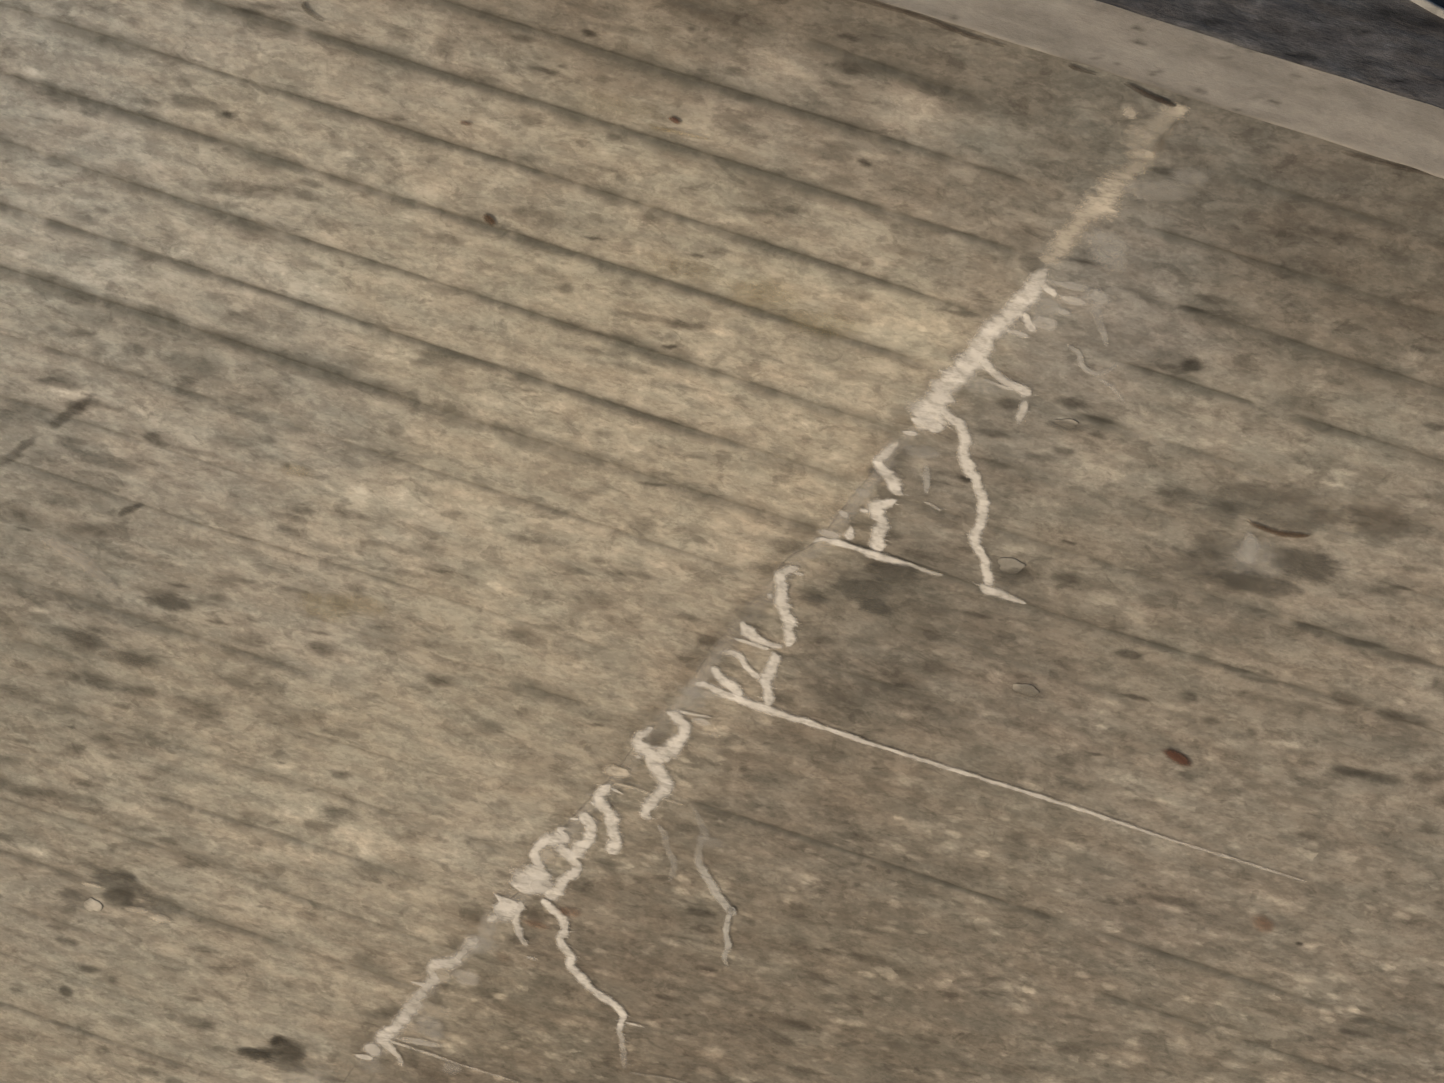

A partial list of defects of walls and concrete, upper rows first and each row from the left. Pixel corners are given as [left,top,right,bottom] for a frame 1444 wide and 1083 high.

water stain [814,172,1131,604]
water stain [696,566,1136,828]
water stain [355,958,461,1060]
efflorescence [488,711,693,1033]
water stain [697,861,736,950]